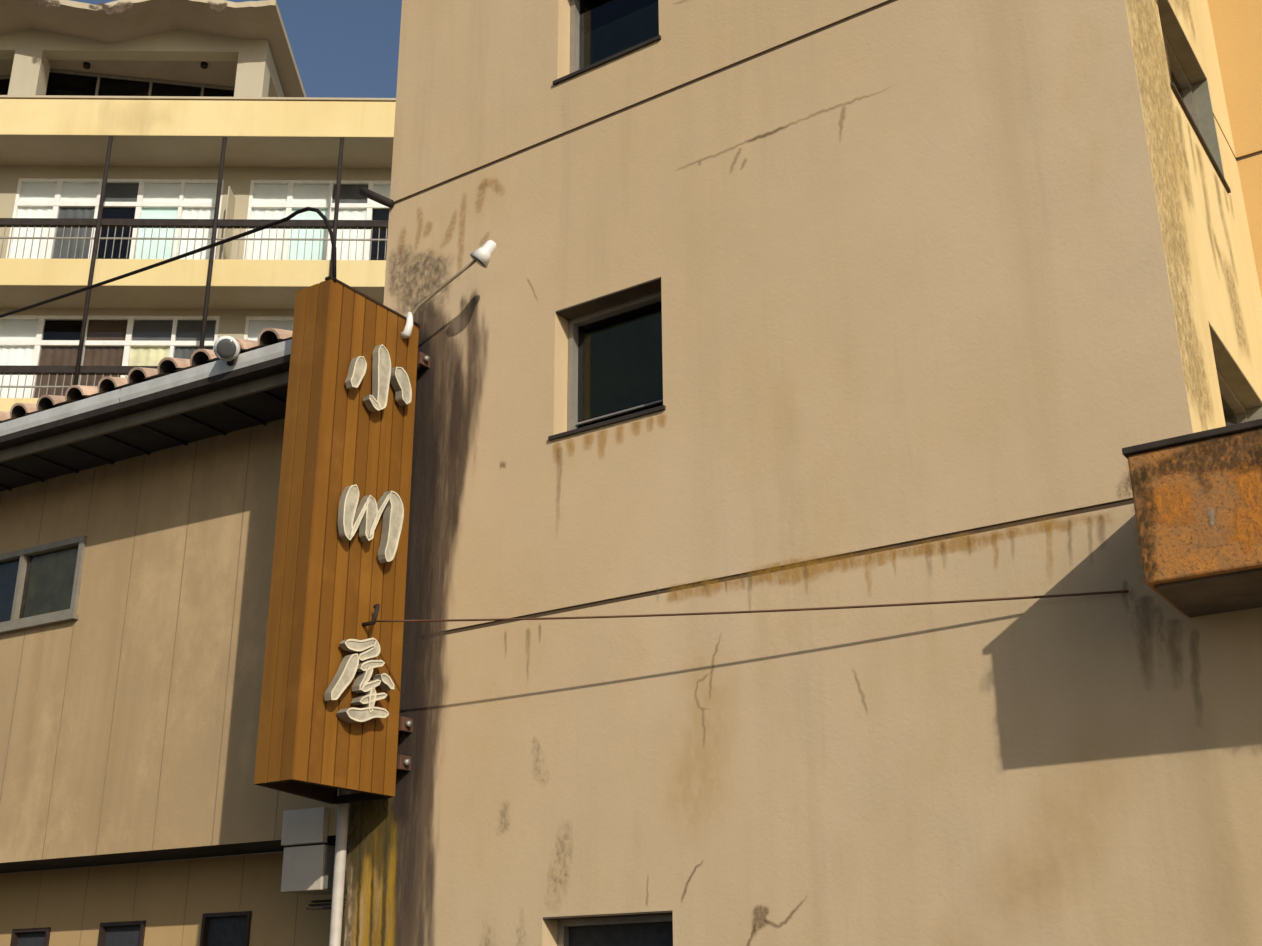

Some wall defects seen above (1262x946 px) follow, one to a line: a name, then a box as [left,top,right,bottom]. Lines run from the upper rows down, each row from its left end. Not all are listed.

water stain [1126,0,1211,422]
water stain [344,254,481,946]
water stain [1120,427,1262,582]